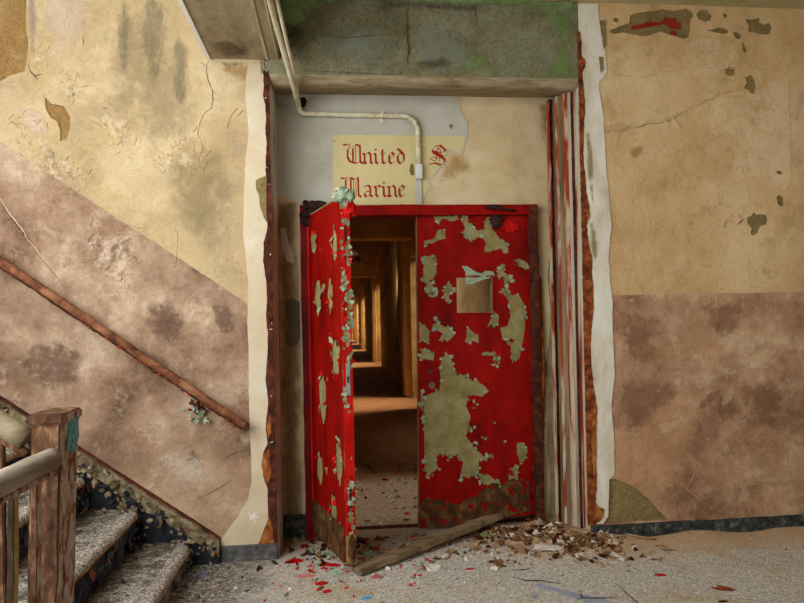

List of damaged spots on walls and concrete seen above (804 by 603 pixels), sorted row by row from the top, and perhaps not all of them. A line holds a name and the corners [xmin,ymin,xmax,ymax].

flaking render [0,0,29,81]
damp [283,4,307,26]
flaking render [46,99,71,141]
crack [607,90,738,132]
peeling [707,75,791,206]
crack [0,199,67,291]
peeling [74,64,468,603]
peeling [417,316,478,382]
peeling [489,260,529,329]
rust [577,30,605,526]
flaking render [578,4,771,524]
peeling [458,420,501,488]